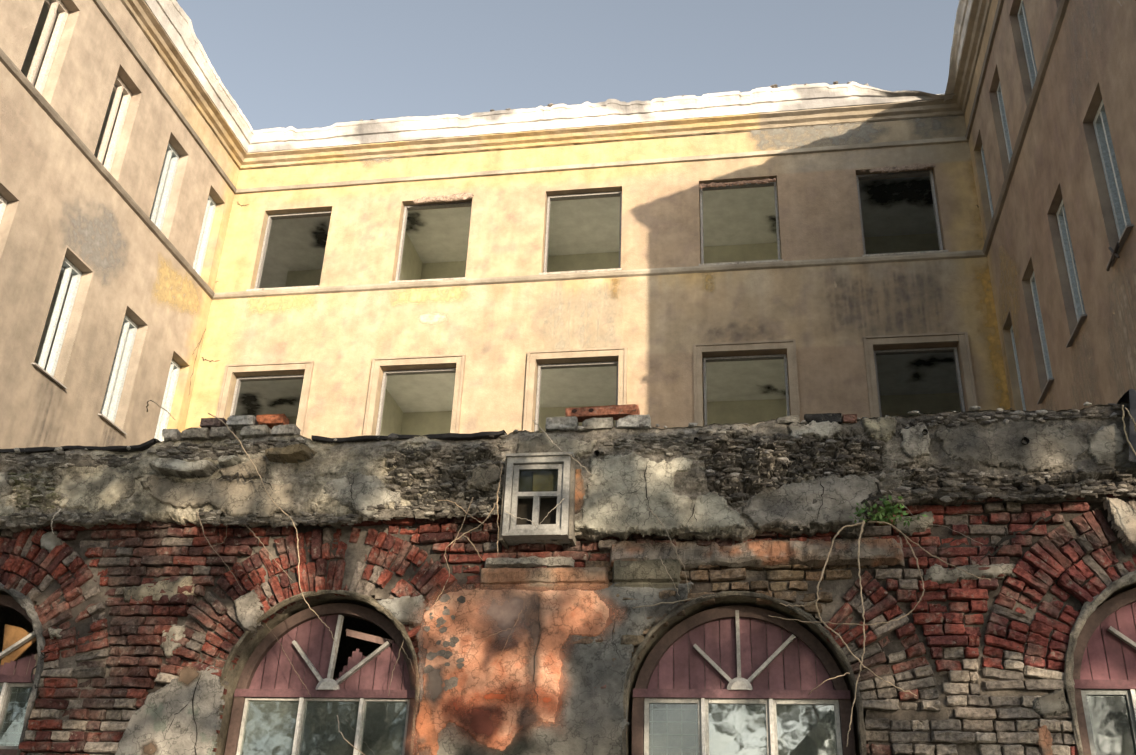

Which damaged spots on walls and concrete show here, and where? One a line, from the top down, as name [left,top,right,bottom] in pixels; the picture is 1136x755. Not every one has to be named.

flaking render [0,404,1136,537]
crack [164,671,202,755]
flaking render [377,582,694,755]